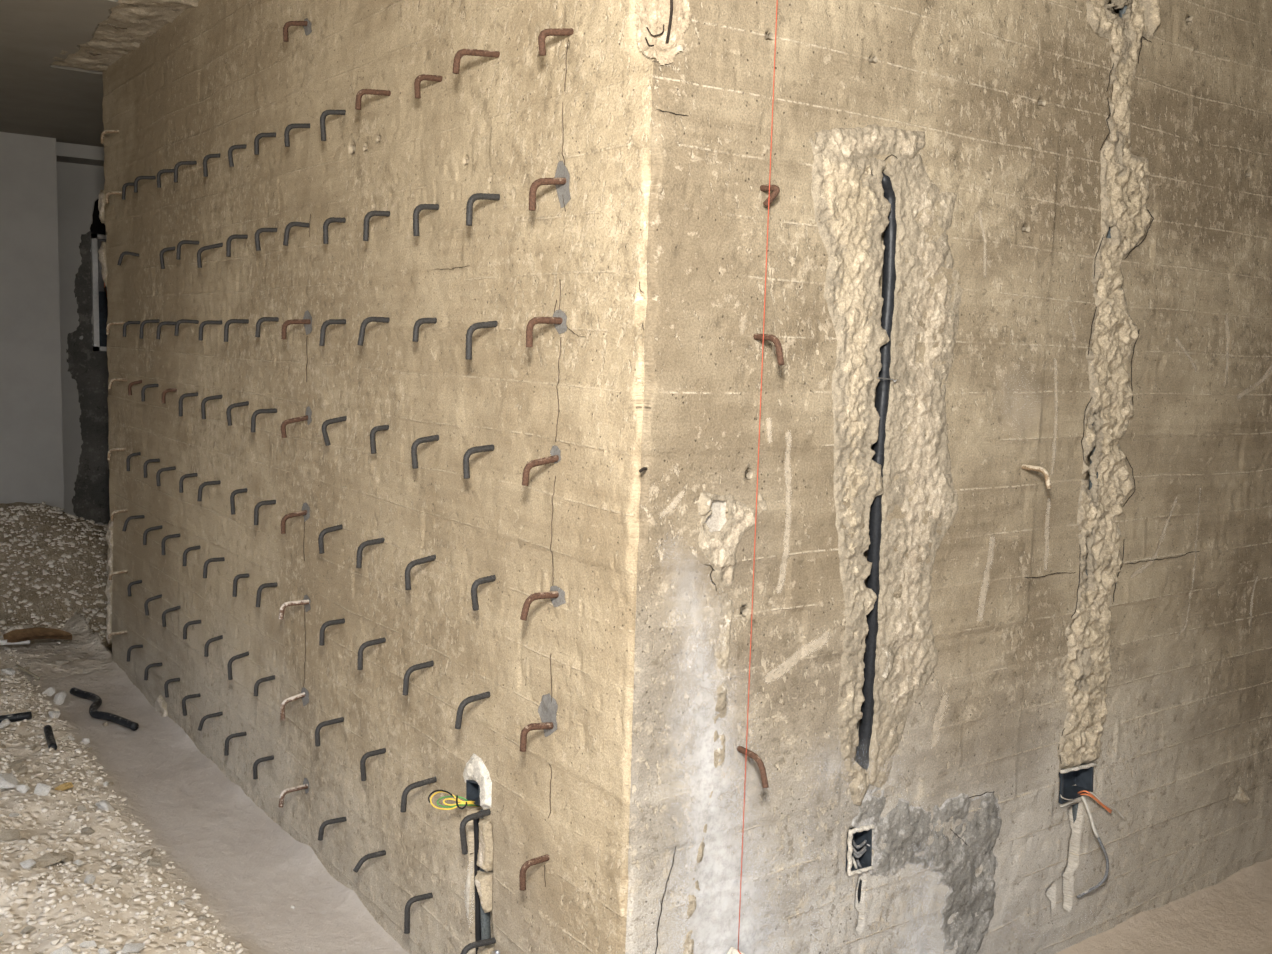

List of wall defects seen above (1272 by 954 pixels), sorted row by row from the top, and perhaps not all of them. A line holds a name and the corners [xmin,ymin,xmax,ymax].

flaking render [52,0,201,71]
spalling [635,0,693,65]
crack [561,44,569,211]
crack [549,476,557,586]
crack [554,279,585,442]
spalling [809,124,963,806]
spalling [1056,0,1158,769]